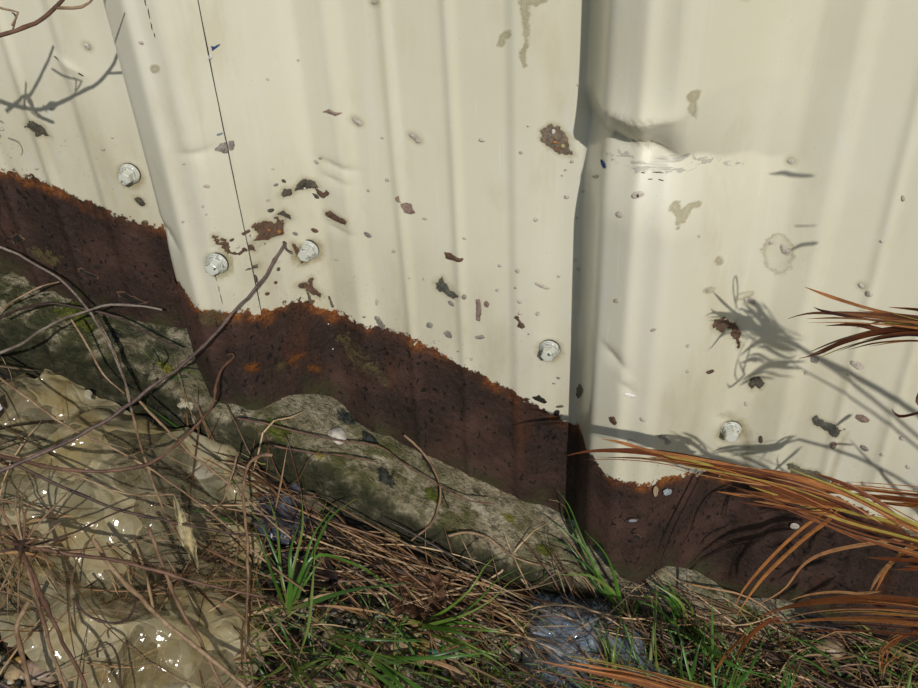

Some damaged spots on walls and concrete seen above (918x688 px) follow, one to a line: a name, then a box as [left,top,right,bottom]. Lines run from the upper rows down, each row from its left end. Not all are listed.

corrosion [0,168,918,653]
peeling [812,416,842,449]
peeling [787,463,838,494]